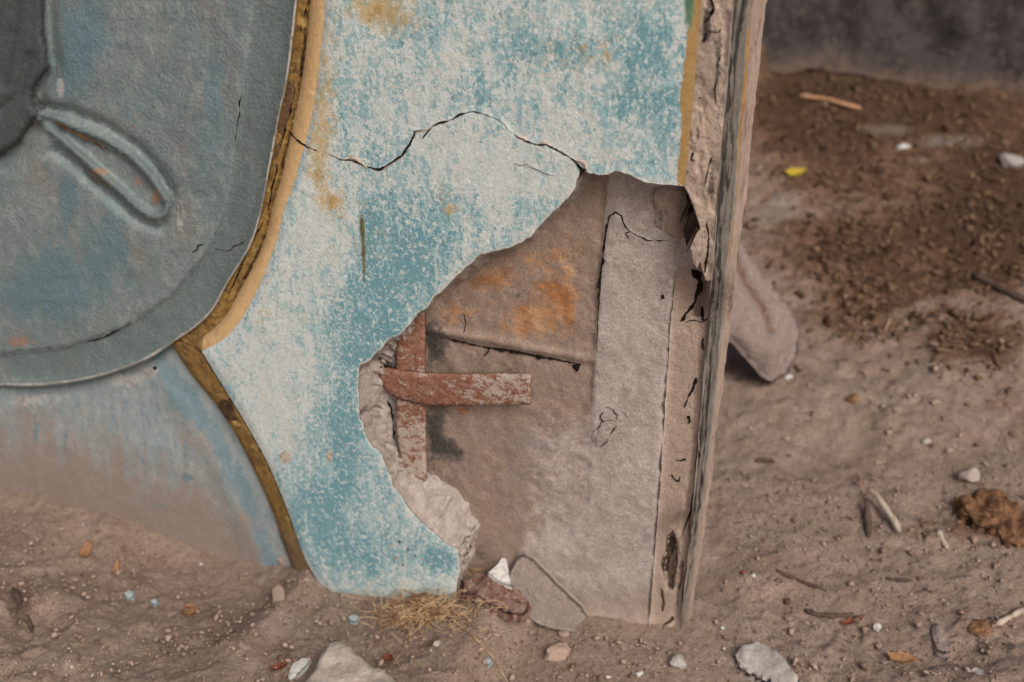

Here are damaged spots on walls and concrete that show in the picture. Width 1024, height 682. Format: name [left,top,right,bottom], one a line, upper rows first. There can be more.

crack [698,0,721,103]
crack [192,87,588,302]
crack [89,322,132,341]
crack [388,401,399,449]
flaking render [358,171,711,629]
crack [445,152,712,625]